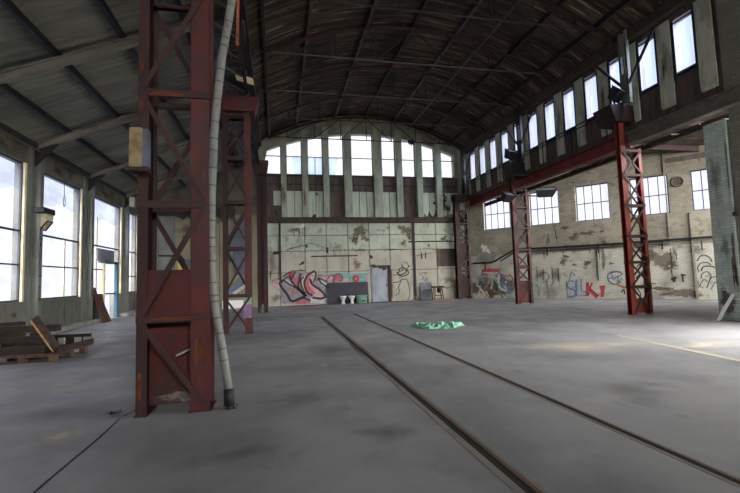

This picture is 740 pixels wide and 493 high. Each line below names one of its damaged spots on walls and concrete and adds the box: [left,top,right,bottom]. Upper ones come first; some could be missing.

peeling [352,225,369,244]
peeling [397,225,411,245]
peeling [636,249,702,298]